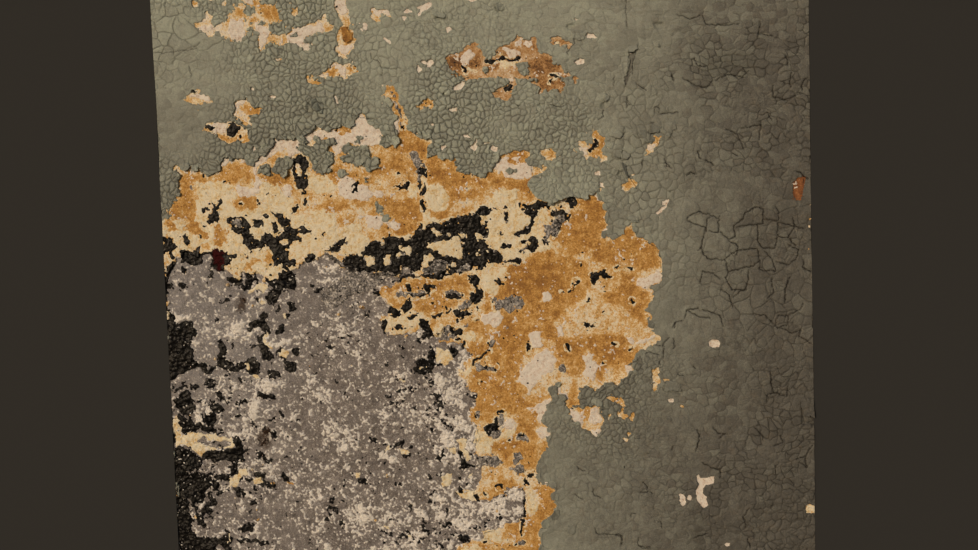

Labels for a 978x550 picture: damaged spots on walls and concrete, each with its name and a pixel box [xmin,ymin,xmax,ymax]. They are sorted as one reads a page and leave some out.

crack [727,59,803,156]
flaking render [161,0,669,550]
crack [651,207,810,376]
peeling [679,474,714,508]